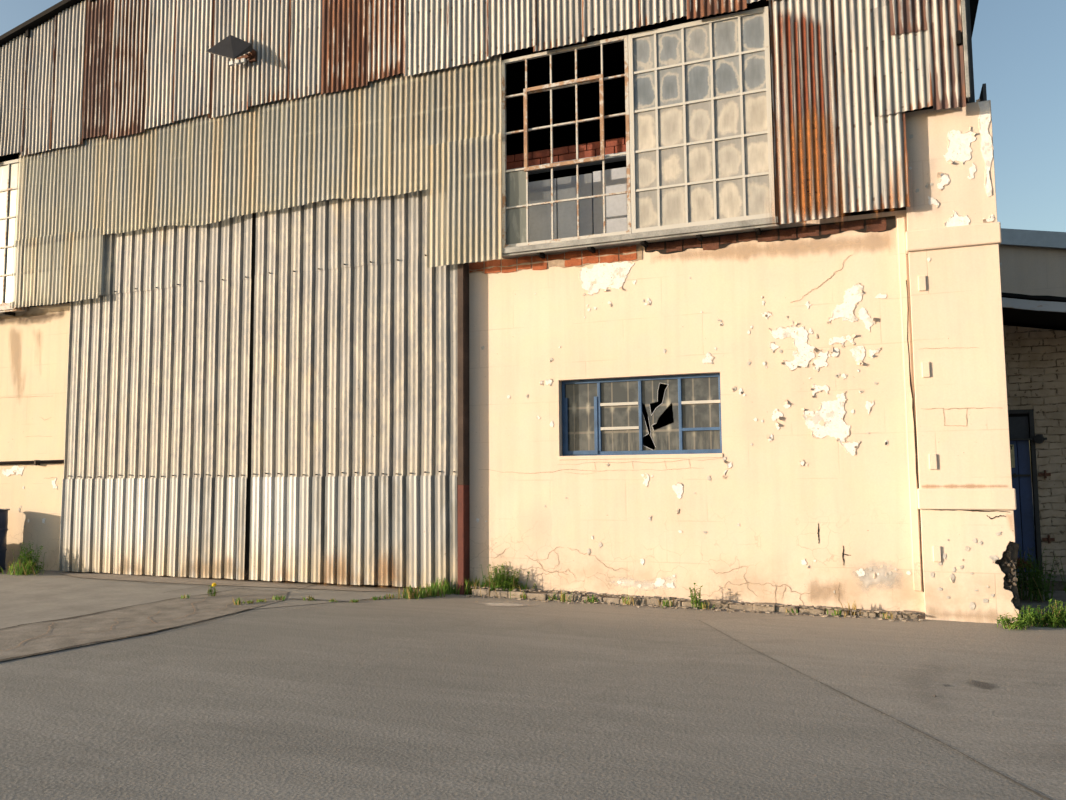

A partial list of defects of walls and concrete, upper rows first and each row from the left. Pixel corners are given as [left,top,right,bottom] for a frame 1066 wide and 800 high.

corrosion [776,13,832,217]
peeling [915,98,994,208]
peeling [942,210,970,228]
flaking render [469,216,896,318]
peeling [747,283,887,456]
crack [479,458,723,474]
crack [491,547,630,578]
crack [683,523,851,603]
peeling [930,538,983,599]
spalling [969,532,1021,611]